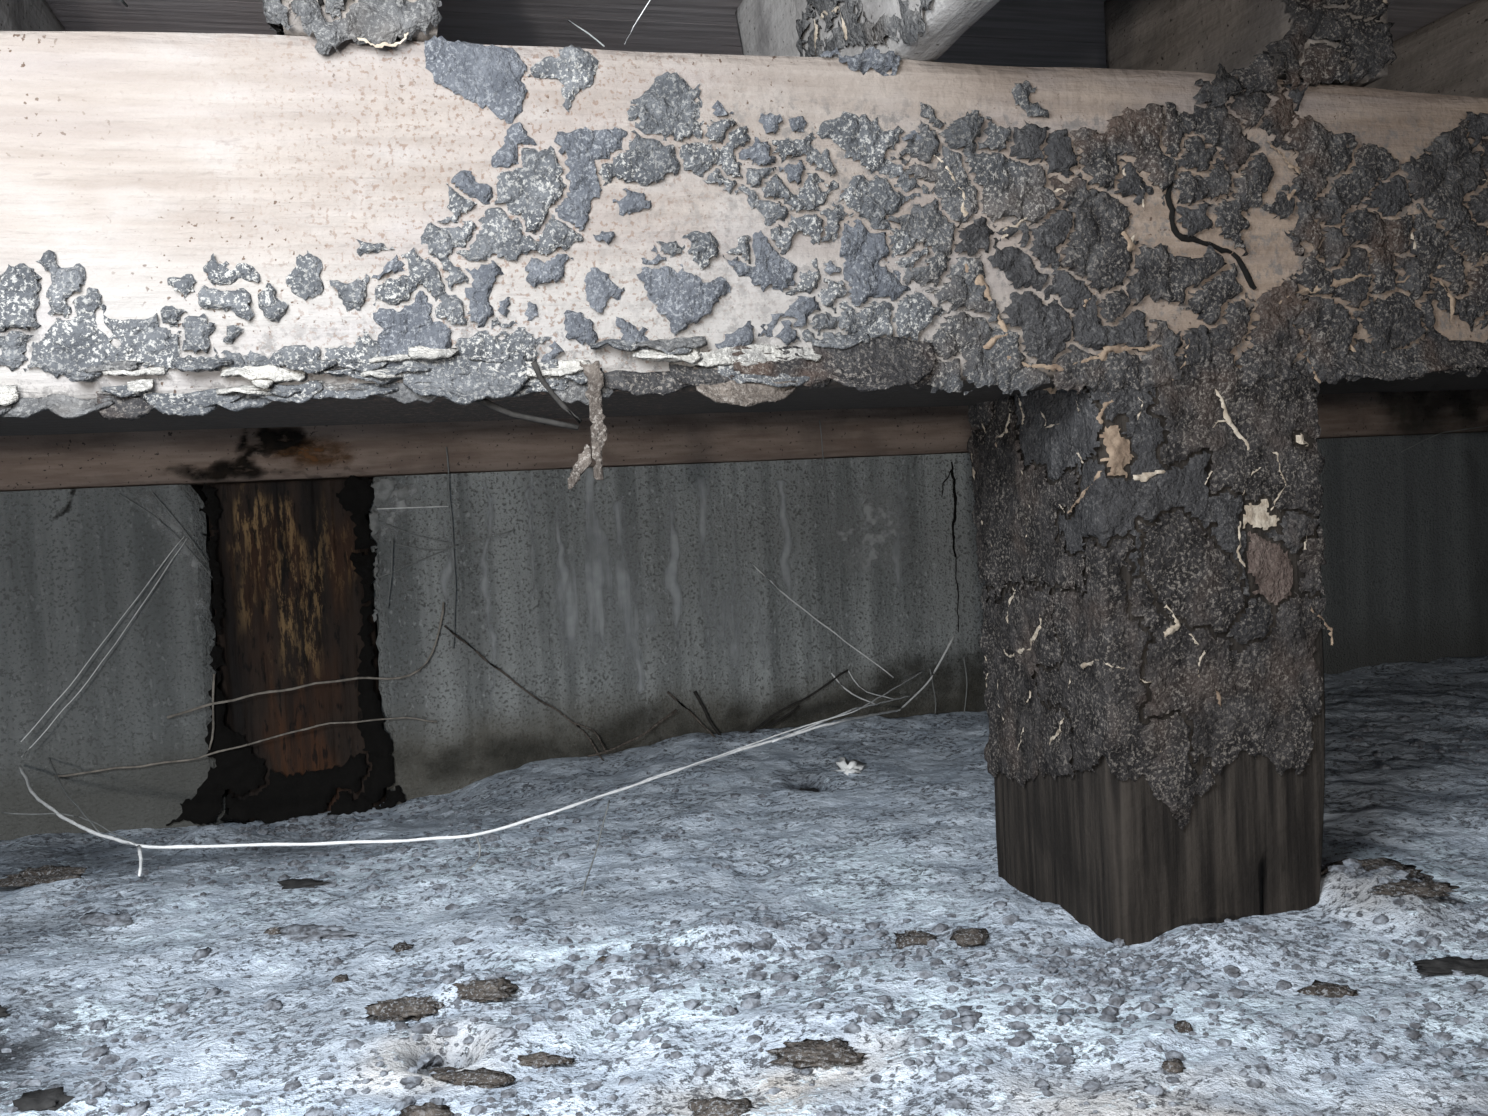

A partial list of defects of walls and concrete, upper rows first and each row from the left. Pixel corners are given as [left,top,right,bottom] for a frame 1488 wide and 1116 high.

peeling [0,0,1488,831]